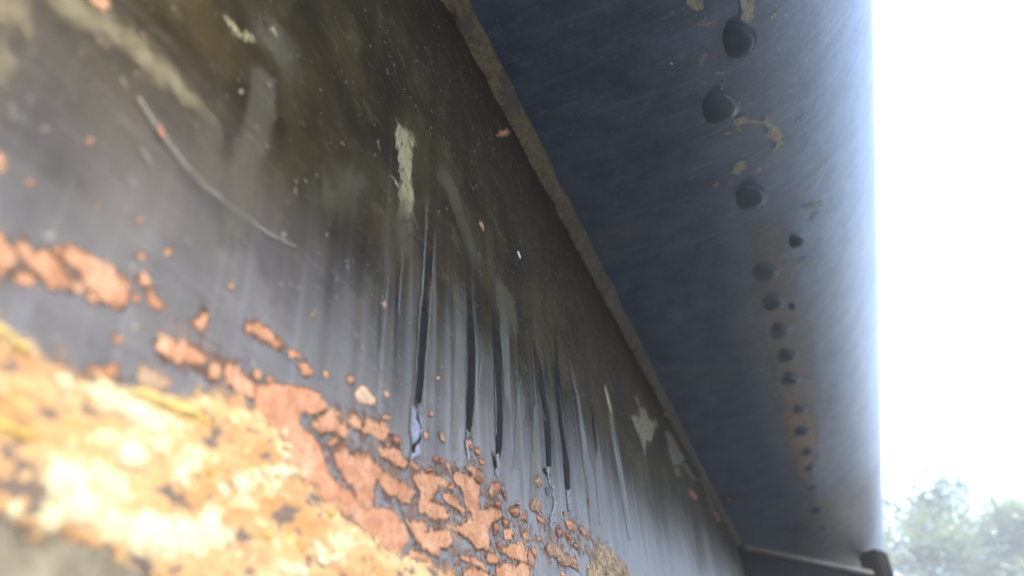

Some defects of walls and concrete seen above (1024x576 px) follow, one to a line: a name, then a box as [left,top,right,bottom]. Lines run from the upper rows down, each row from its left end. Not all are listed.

rust [0,231,169,313]
peeling [0,316,456,576]
leakage [410,274,429,462]
leakage [466,303,476,459]
leakage [491,306,503,477]
leakage [536,348,571,529]
peeling [582,536,630,576]